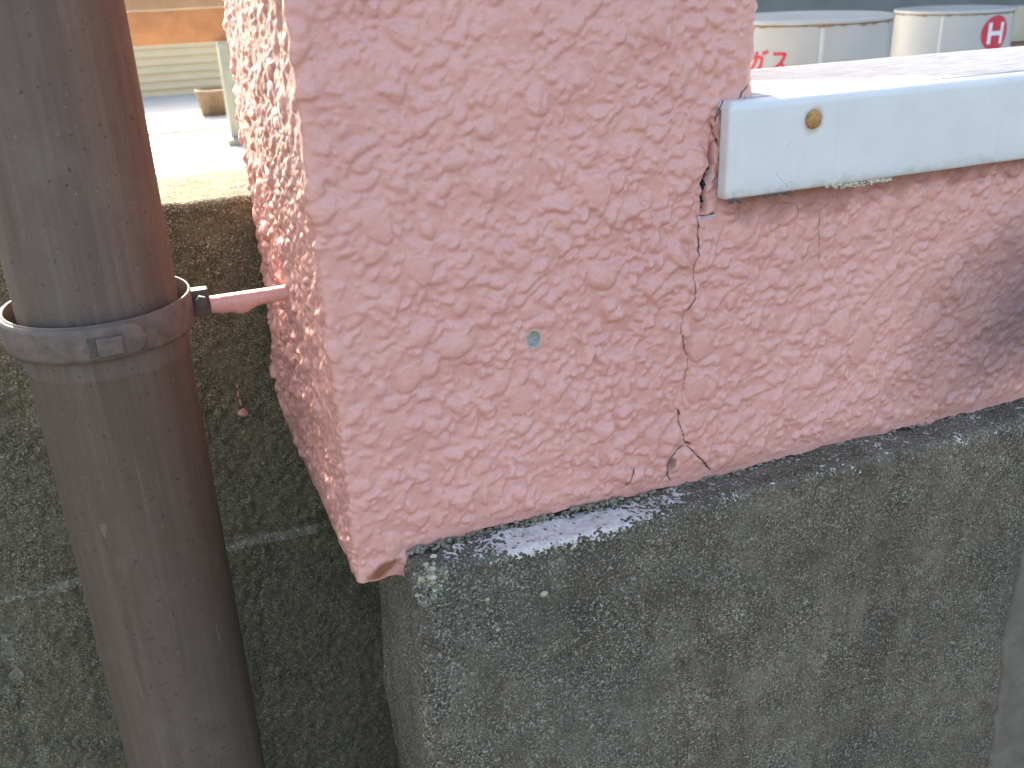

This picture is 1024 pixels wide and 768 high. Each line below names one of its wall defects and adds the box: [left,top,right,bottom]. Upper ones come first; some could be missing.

crack [710,85,748,144]
crack [666,167,715,482]